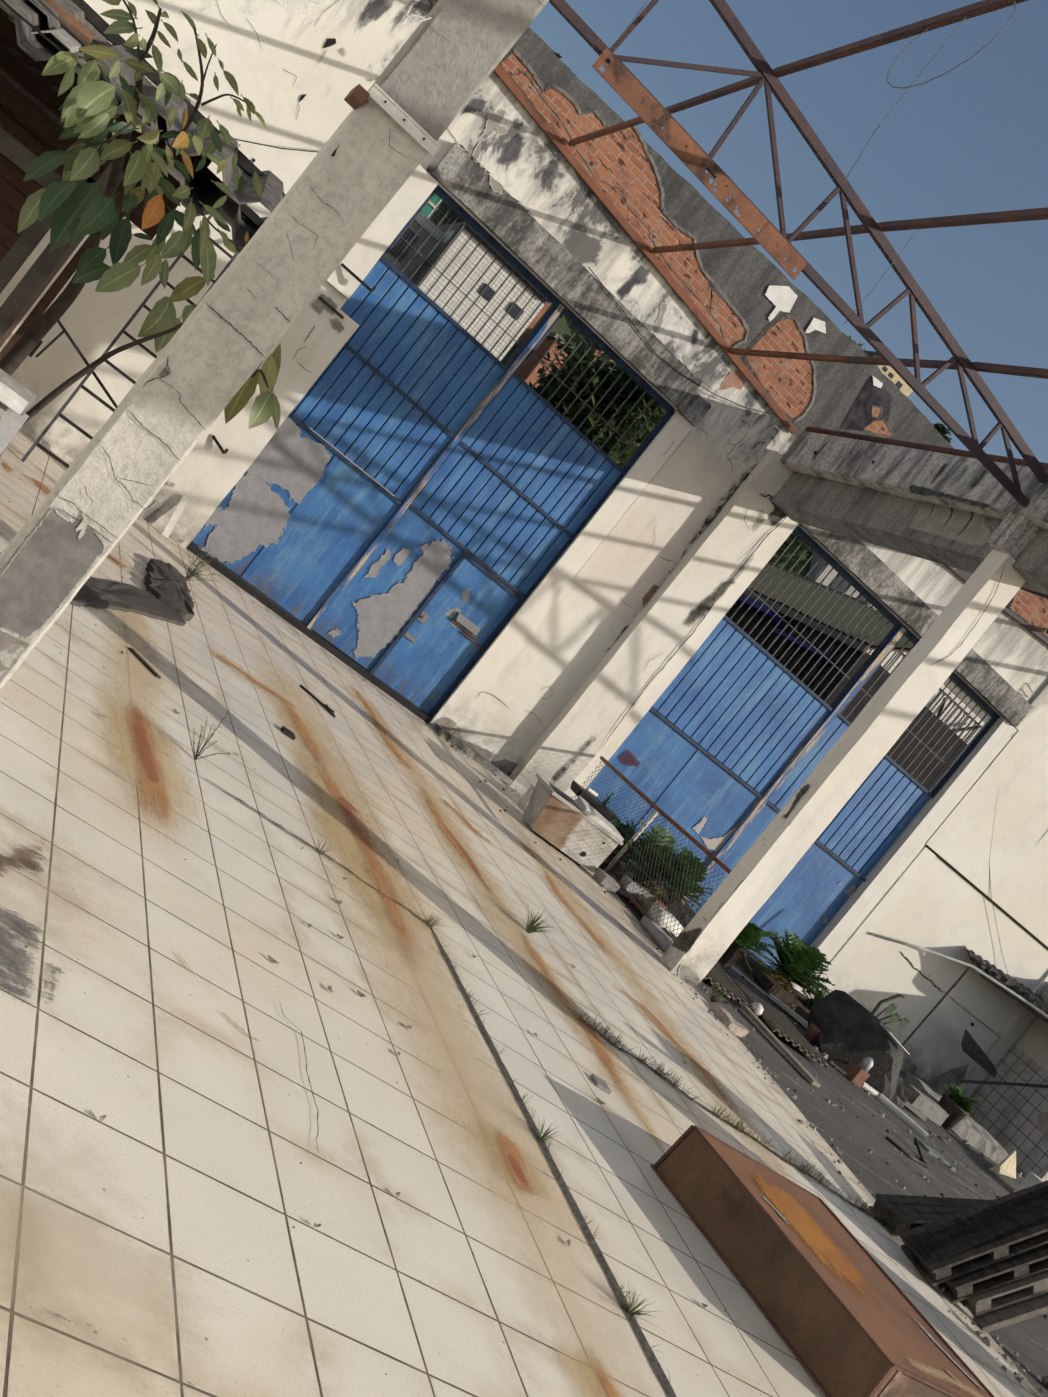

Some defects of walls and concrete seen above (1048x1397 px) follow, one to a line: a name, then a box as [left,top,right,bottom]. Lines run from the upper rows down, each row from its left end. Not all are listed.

leakage [359,0,393,26]
leakage [415,0,433,16]
leakage [462,99,486,114]
leakage [498,134,525,165]
spalling [499,48,826,424]
peeling [140,482,175,523]
peeling [201,416,331,564]
peeling [329,539,455,659]
corrosion [116,611,178,817]
corrosion [215,653,414,944]
corrosion [506,843,781,1173]
corrosion [492,1128,537,1193]